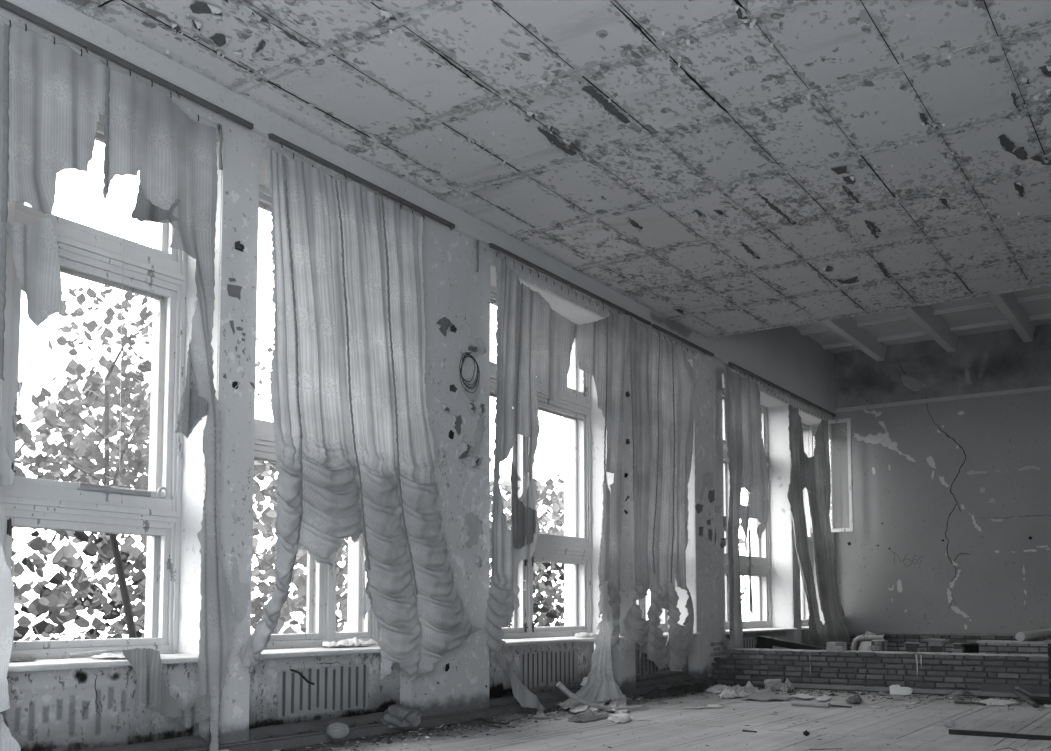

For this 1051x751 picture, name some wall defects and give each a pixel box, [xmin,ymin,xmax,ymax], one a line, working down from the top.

peeling [57,0,1051,339]
spalling [841,410,949,487]
crack [898,361,966,608]
spalling [945,553,971,629]